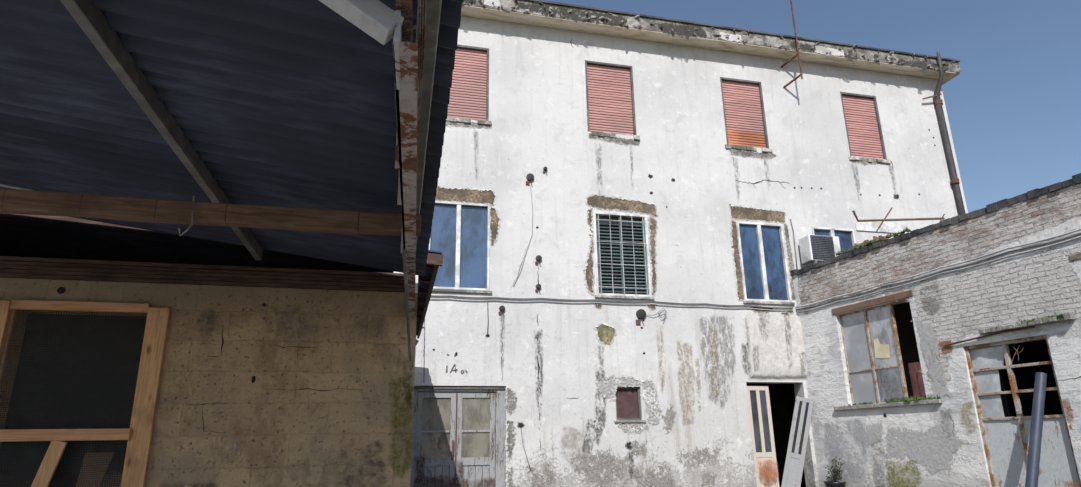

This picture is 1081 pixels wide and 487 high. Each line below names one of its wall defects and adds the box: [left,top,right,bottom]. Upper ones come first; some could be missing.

spalling [470,0,698,37]
spalling [770,35,961,73]
spalling [728,149,777,160]
spalling [850,156,893,166]
spalling [435,185,502,246]
spalling [583,174,668,311]
flaking render [728,183,1081,399]
spalling [593,322,617,347]
spalling [504,386,567,487]
spalling [572,374,722,487]
spalling [866,413,962,476]